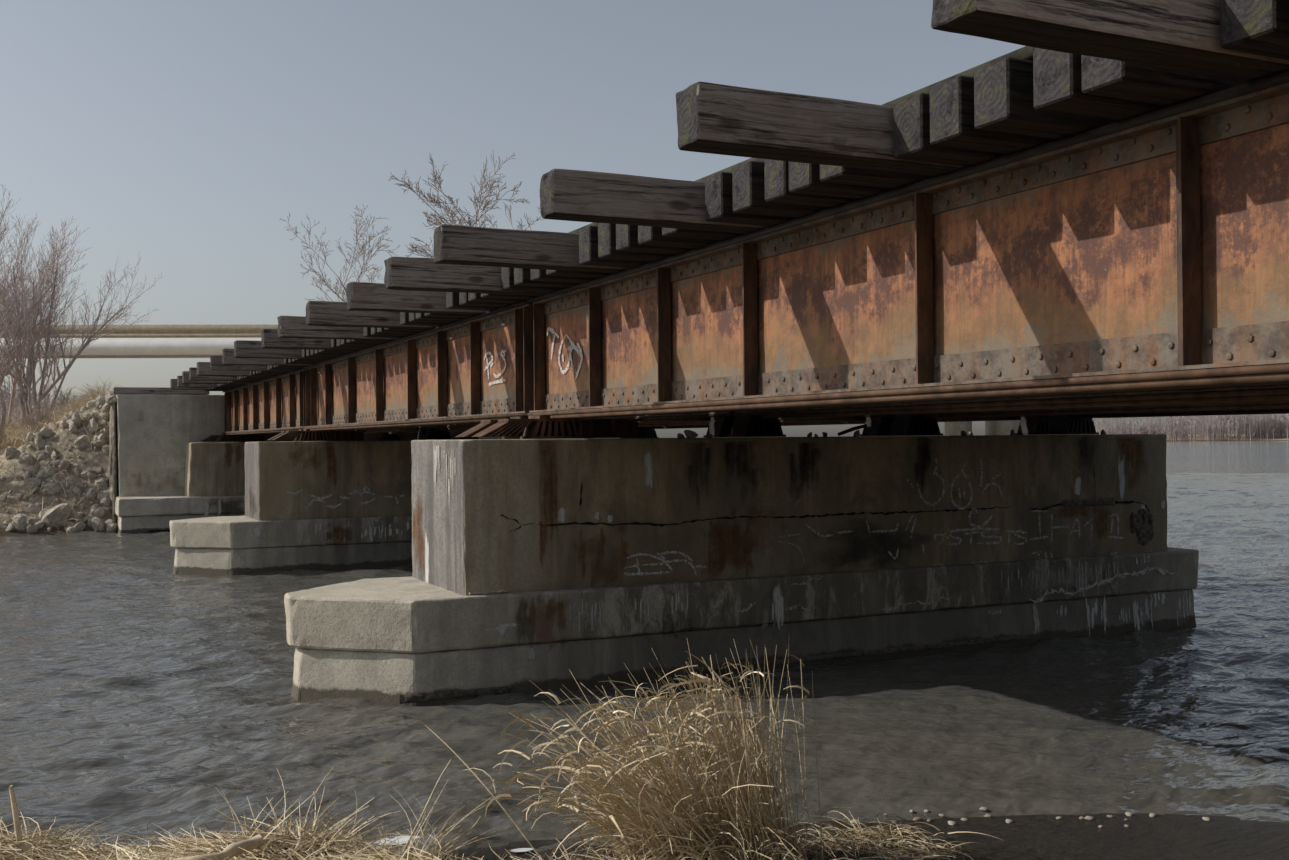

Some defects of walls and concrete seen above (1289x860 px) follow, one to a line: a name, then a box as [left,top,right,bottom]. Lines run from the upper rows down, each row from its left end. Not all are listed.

crack [501,485,1062,531]
crack [1115,500,1150,512]
efflorescence [1001,555,1191,635]